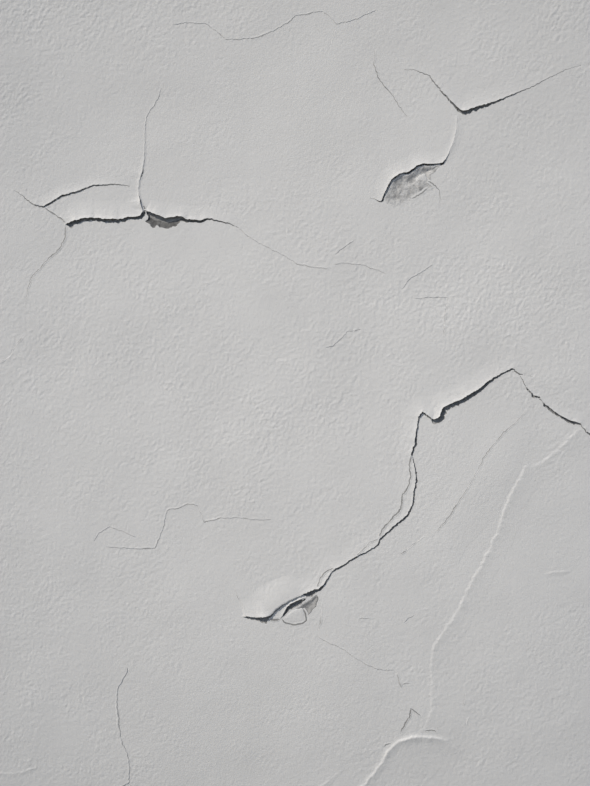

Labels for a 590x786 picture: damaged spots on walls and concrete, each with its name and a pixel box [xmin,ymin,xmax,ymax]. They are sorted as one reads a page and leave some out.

crack [174,10,376,48]
crack [372,49,407,117]
crack [405,61,581,115]
flaking render [371,114,462,207]
crack [14,88,385,308]
crack [402,264,450,337]
crack [94,502,271,550]
crack [234,352,590,688]
flaking render [279,595,318,627]
crack [115,668,136,786]